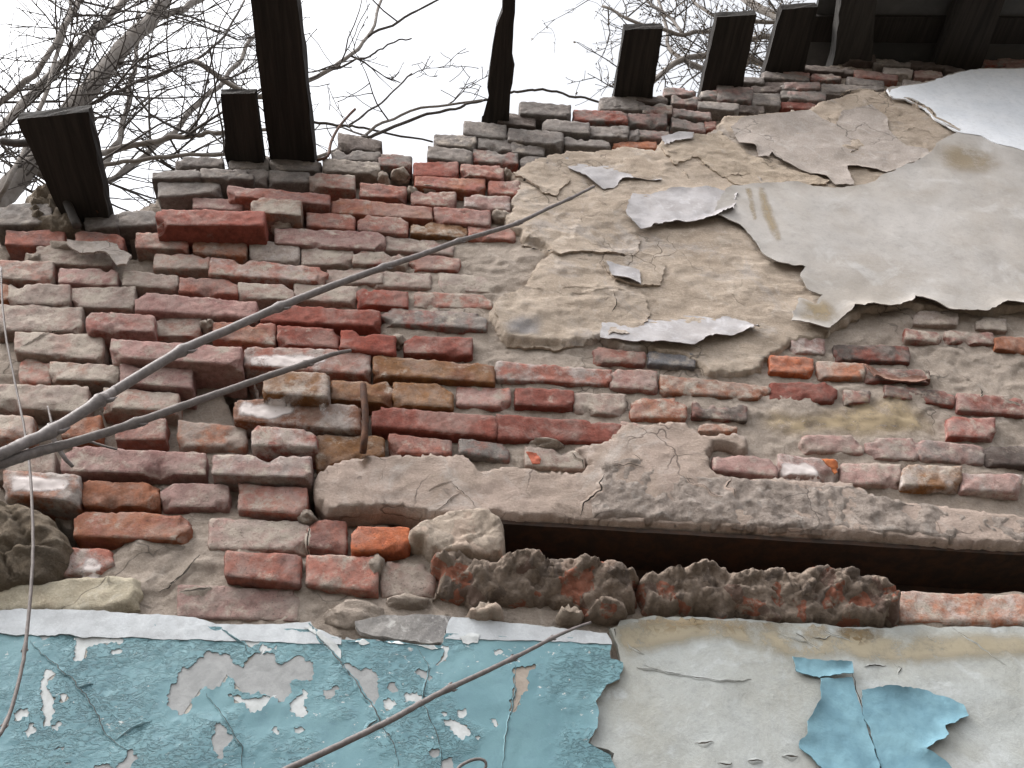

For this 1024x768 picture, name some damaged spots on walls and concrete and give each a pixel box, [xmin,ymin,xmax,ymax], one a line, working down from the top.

flaking render [731,104,929,185]
flaking render [566,157,738,229]
damp [747,189,775,229]
flaking render [607,261,641,284]
crack [571,452,645,516]
peeling [14,669,67,737]
peeling [167,641,314,733]
peeling [304,626,449,710]
peeling [441,708,480,740]
crack [609,627,750,683]
crack [778,627,852,654]
peeling [793,656,969,768]